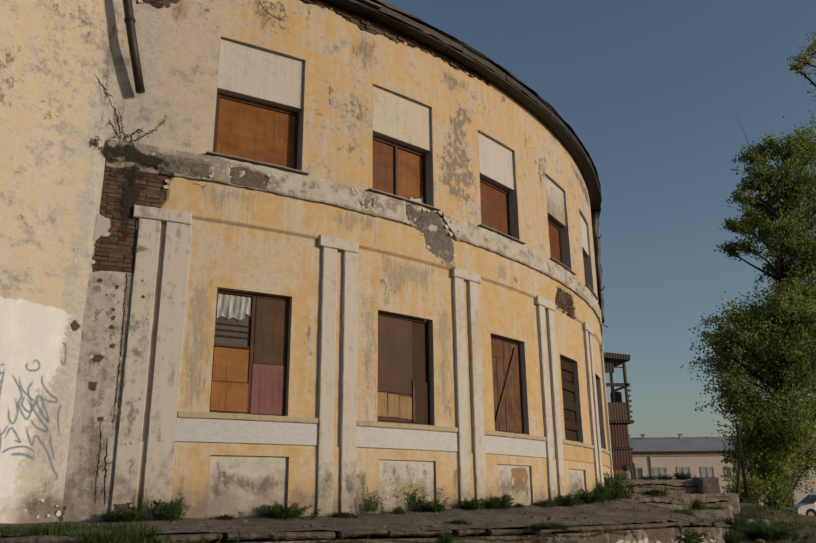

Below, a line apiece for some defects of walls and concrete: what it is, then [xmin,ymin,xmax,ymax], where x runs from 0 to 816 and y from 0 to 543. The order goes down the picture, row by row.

flaking render [136,0,179,9]
flaking render [300,0,489,86]
peeling [437,106,477,204]
spalling [406,204,460,269]
flaking render [86,153,213,421]
flaking render [555,287,575,320]
crack [92,274,129,506]
peeling [511,467,528,494]